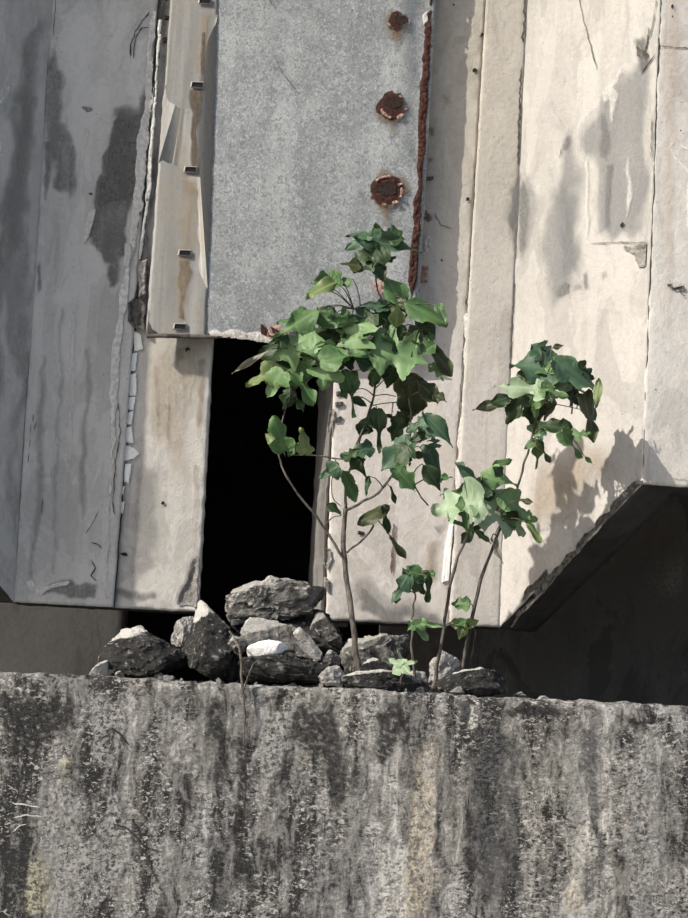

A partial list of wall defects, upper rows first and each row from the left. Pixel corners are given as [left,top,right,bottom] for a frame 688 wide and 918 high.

crack [649,1,688,49]
flaking render [84,209,96,244]
water stain [89,95,146,286]
flaking render [105,11,162,580]
corrosion [370,0,452,294]
water stain [25,786,132,918]
water stain [88,693,126,771]
water stain [204,698,257,892]
water stain [260,703,367,812]
water stain [376,700,402,767]
water stain [376,742,437,918]
water stain [619,716,662,918]